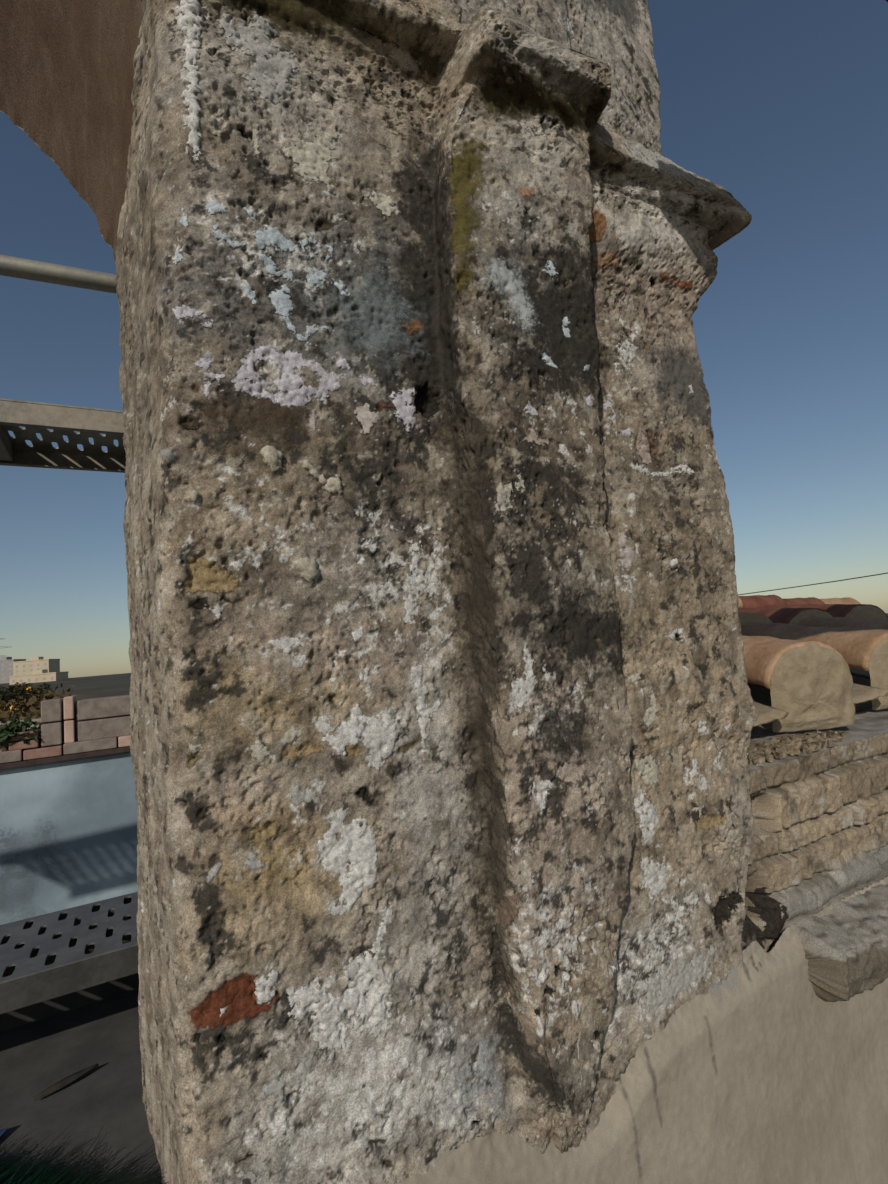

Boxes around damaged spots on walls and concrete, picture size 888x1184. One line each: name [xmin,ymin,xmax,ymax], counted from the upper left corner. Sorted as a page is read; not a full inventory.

peeling [187,907,393,1101]